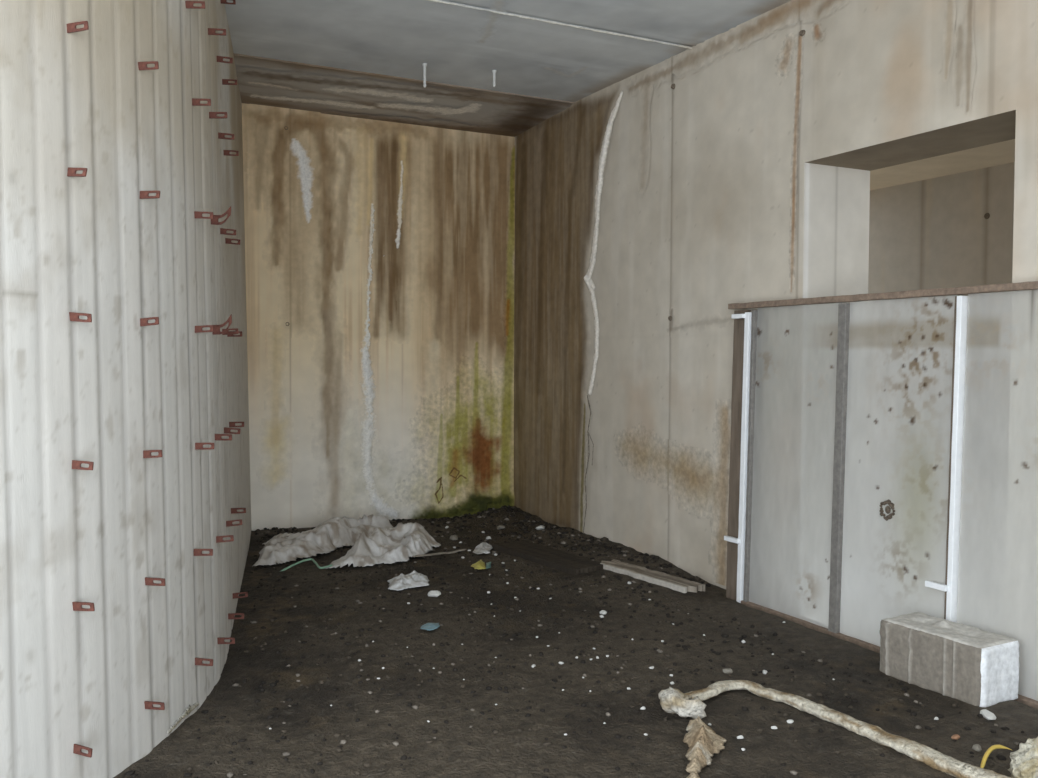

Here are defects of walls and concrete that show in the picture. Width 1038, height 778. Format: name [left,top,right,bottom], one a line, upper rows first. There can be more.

corrosion [447,412,507,492]
damp [236,0,850,533]